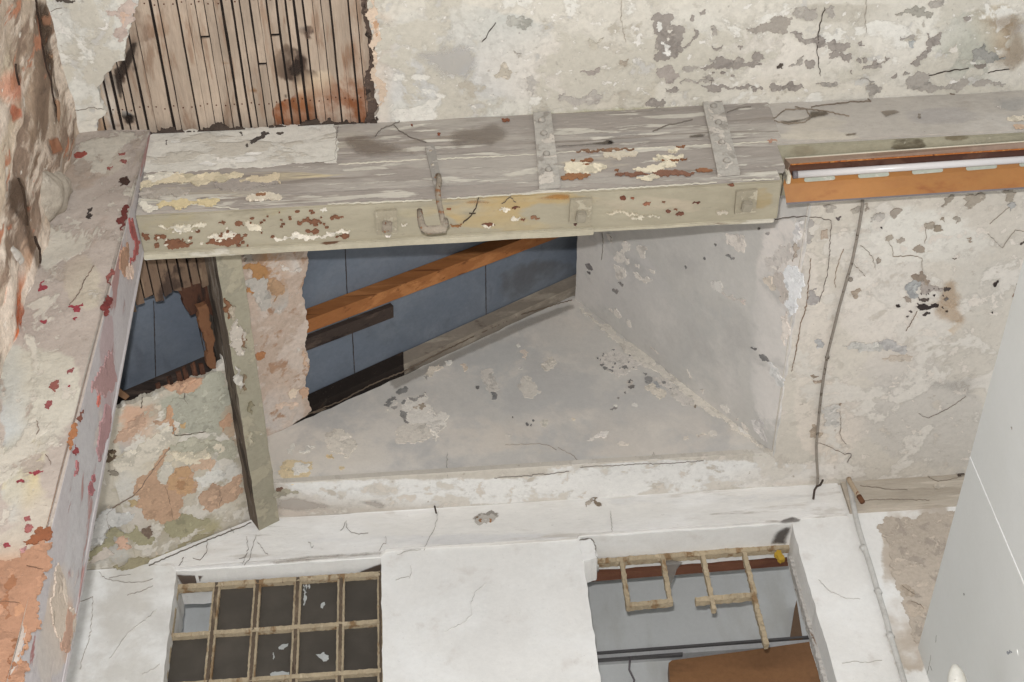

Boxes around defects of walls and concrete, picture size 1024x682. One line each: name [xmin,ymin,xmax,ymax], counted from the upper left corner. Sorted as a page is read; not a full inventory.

peeling [150,0,388,147]
leakage [455,126,502,144]
crack [463,196,516,223]
peeling [561,145,713,181]
crack [653,119,693,132]
peeling [646,9,804,108]
crack [727,98,871,125]
peeling [746,5,890,98]
crack [775,216,927,372]
peeling [88,298,266,571]
crack [340,514,438,580]
peeling [0,515,77,682]